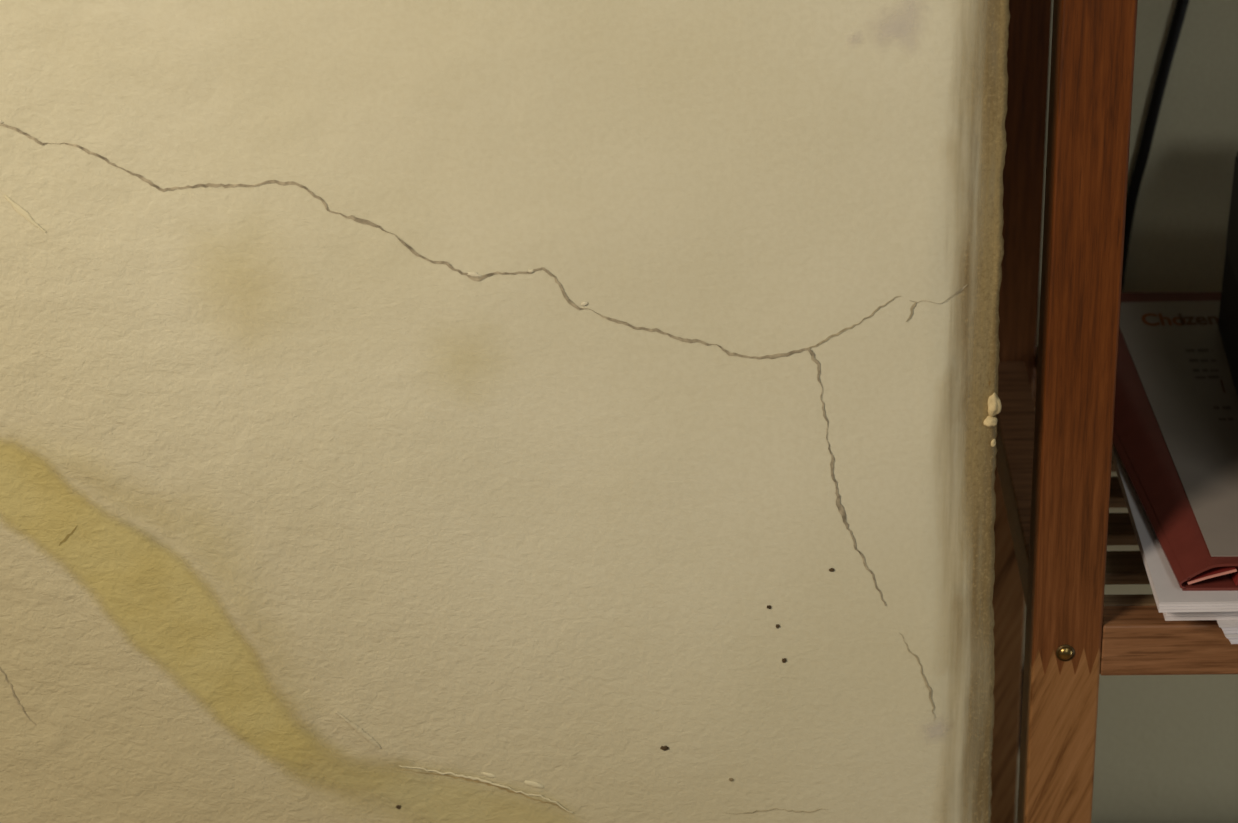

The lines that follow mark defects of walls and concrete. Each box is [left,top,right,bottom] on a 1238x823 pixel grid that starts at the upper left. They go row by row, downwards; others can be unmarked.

crack [0,120,967,606]
crack [0,669,35,724]
damp [0,442,563,823]
crack [902,636,935,720]